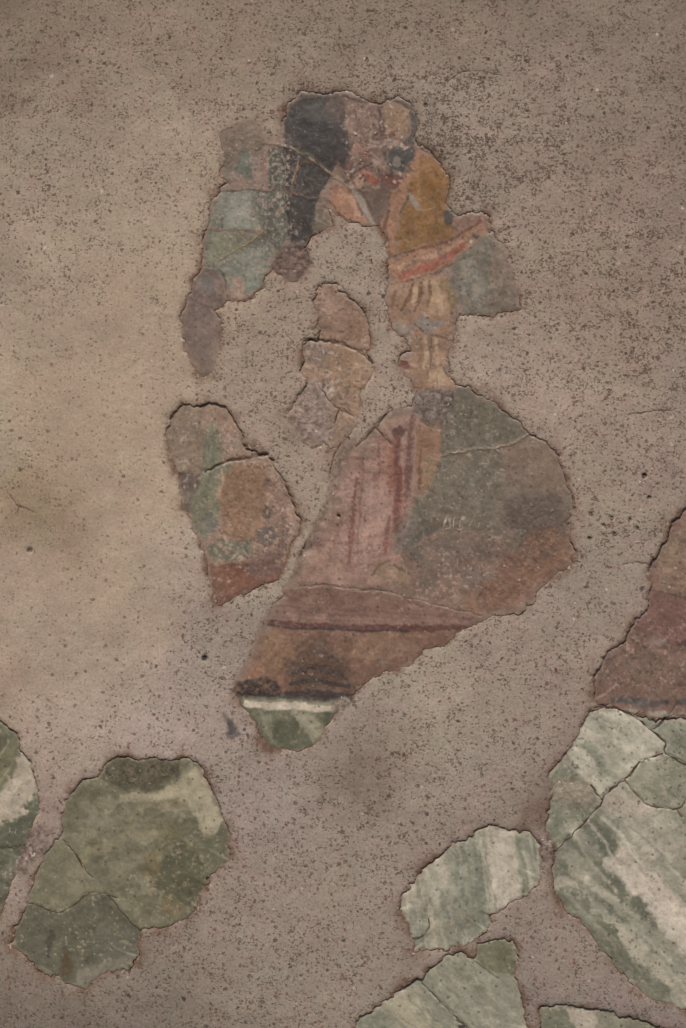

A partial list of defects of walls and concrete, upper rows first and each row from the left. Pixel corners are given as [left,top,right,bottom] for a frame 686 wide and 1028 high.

crack [253,142,352,199]
crack [293,339,373,364]
crack [204,454,268,473]
crack [355,409,393,447]
crack [443,434,528,456]
crack [553,705,686,853]
crack [26,840,140,931]
crack [421,983,469,1028]